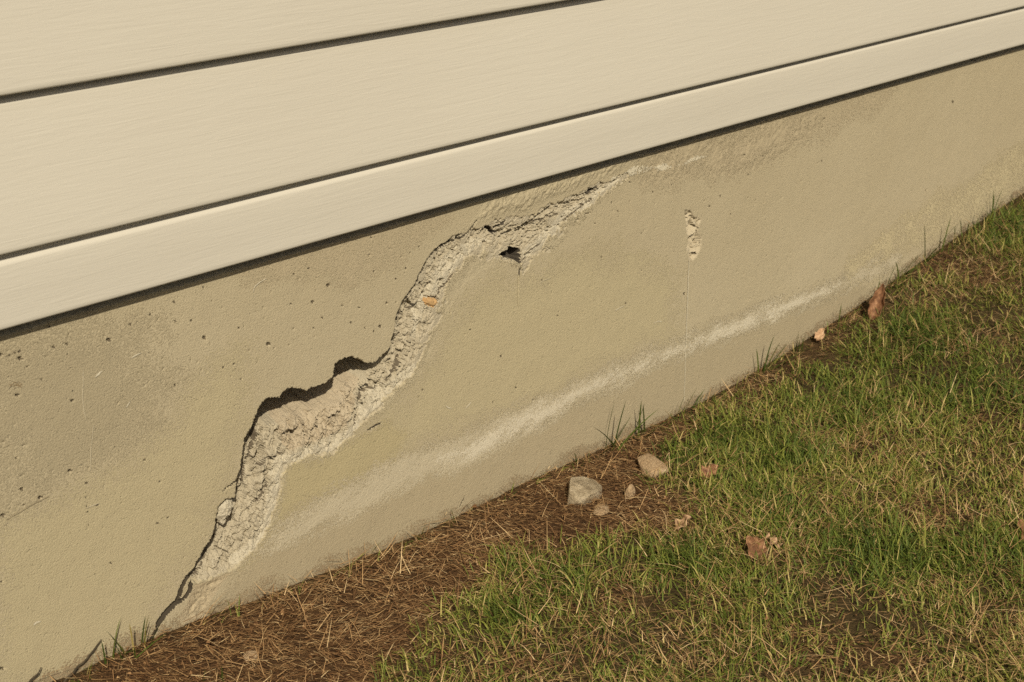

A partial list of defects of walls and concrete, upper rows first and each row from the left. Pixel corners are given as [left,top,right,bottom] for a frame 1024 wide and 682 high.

spalling [187,105,827,583]
leakage [206,140,1024,616]